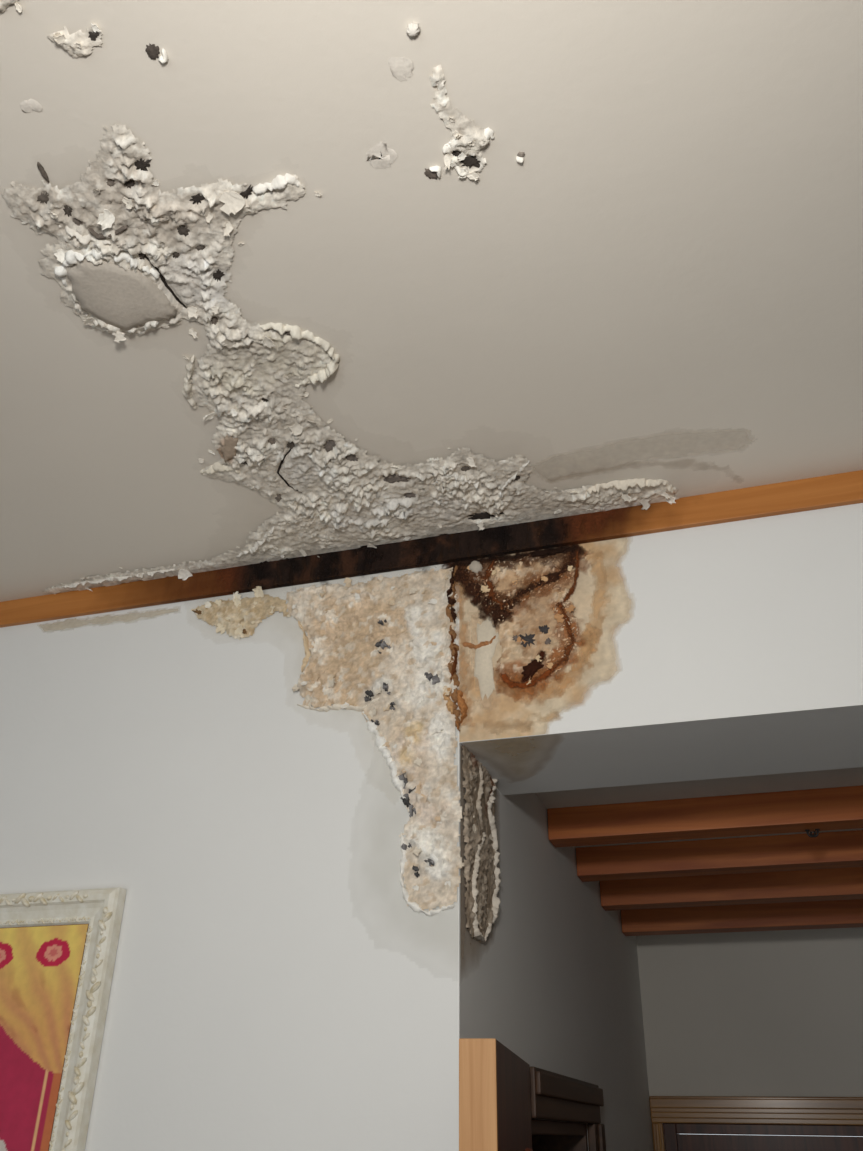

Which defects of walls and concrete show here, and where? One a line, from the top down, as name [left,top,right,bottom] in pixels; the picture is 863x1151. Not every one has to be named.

spalling [47,23,103,58]
peeling [424,65,495,181]
peeling [1,122,679,594]
leakage [42,506,633,631]
corrosion [455,537,630,742]
peeling [191,544,587,942]